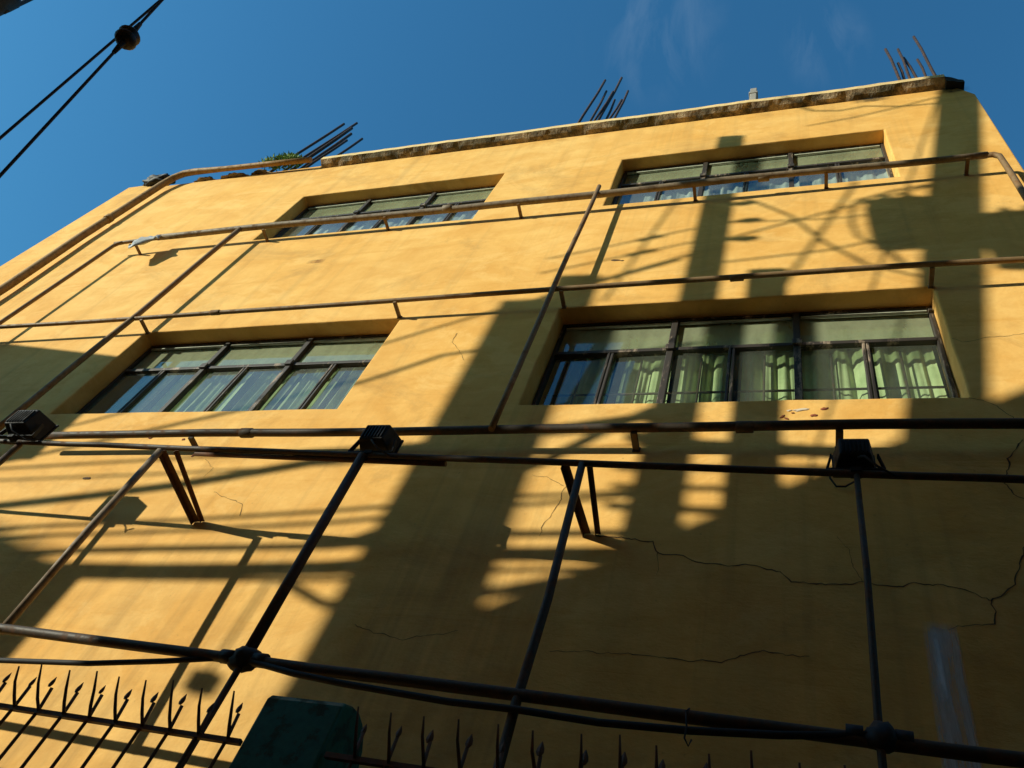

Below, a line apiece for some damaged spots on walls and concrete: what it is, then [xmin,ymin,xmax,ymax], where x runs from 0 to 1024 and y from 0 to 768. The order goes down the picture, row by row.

crack [596,535,1024,630]
crack [550,650,804,663]